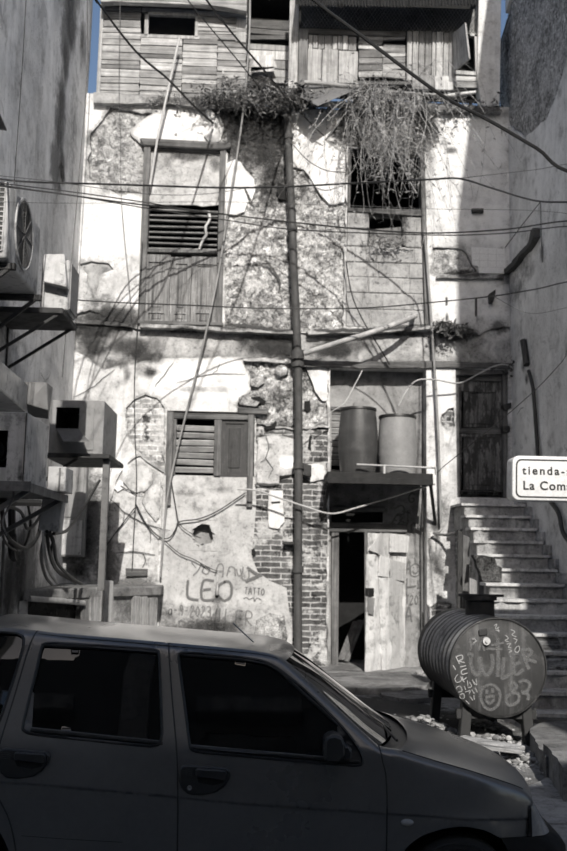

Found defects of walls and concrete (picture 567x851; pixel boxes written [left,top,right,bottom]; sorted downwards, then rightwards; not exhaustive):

leakage [58,0,84,142]
leakage [84,308,149,363]
crack [155,362,245,386]
flaking render [75,106,511,667]
crack [109,485,170,566]